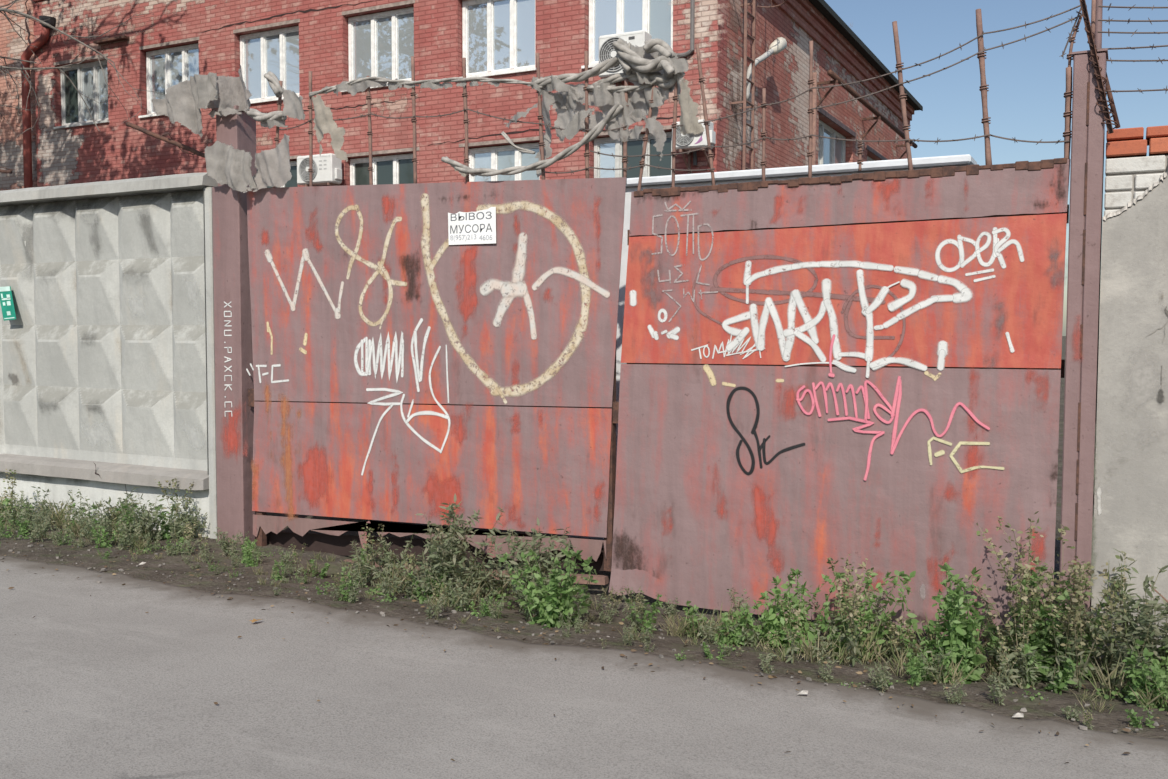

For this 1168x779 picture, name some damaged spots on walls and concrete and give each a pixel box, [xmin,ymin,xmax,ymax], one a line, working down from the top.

peeling [784,22,900,166]